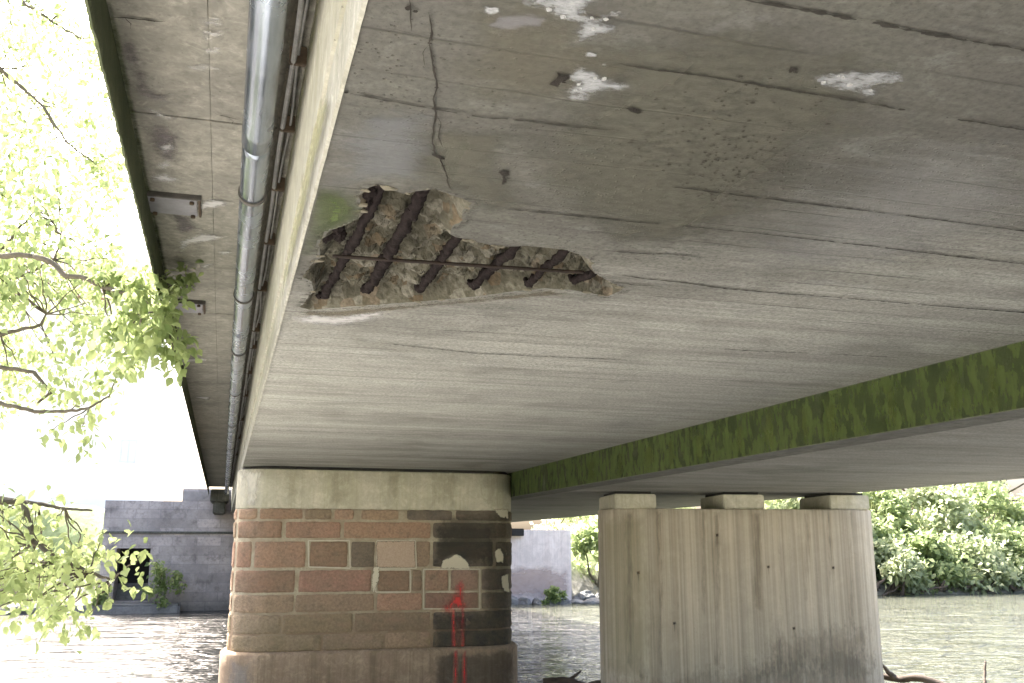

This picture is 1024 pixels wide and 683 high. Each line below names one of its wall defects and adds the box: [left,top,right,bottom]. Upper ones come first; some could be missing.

crack [388,0,481,195]
leakage [554,37,847,238]
spalling [297,184,624,312]